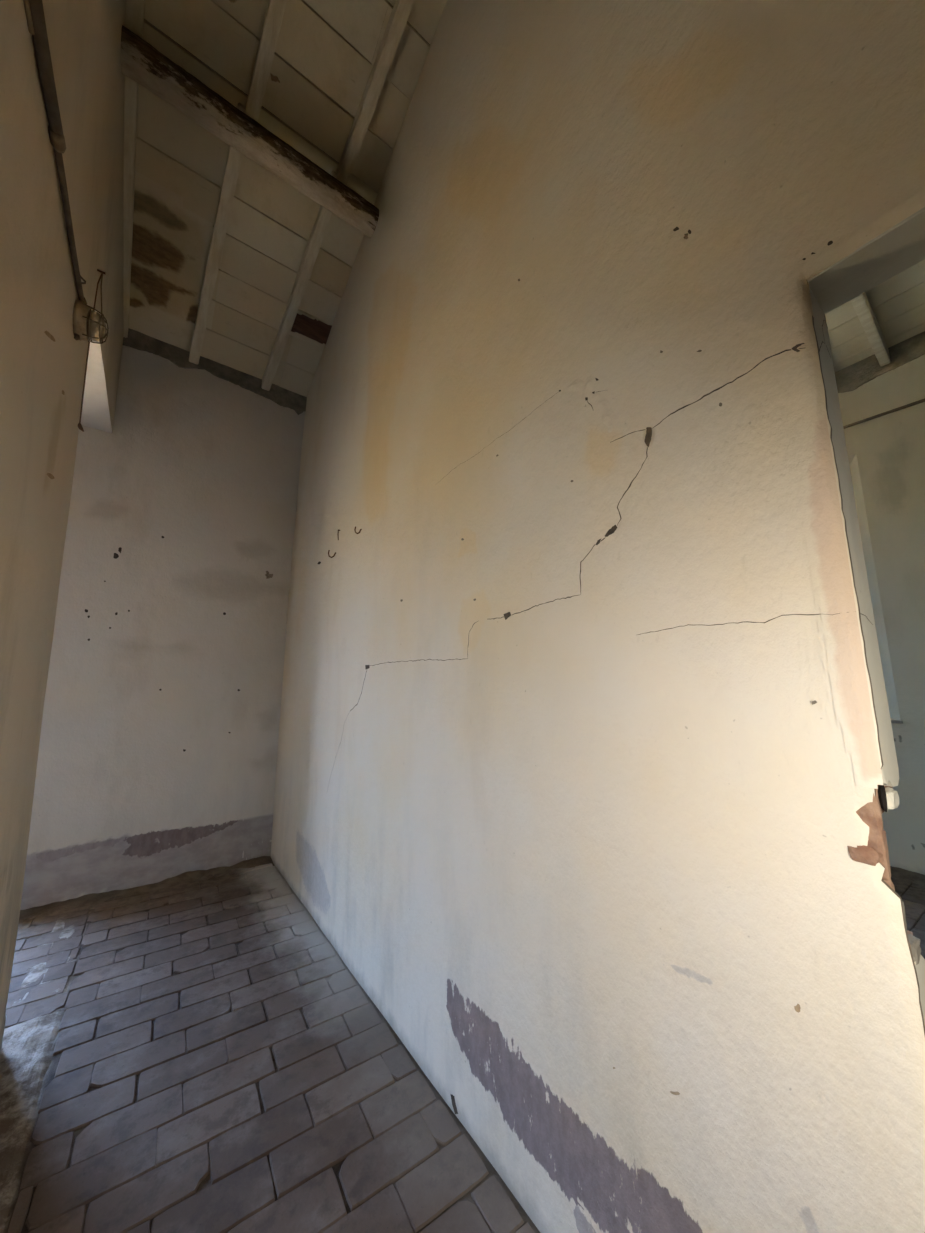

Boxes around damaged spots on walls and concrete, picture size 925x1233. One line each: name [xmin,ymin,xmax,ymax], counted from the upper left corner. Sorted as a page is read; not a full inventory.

water stain [129,171,213,326]
crack [327,316,831,791]
crack [638,613,869,635]
peeling [20,809,273,910]
peeling [445,972,710,1233]